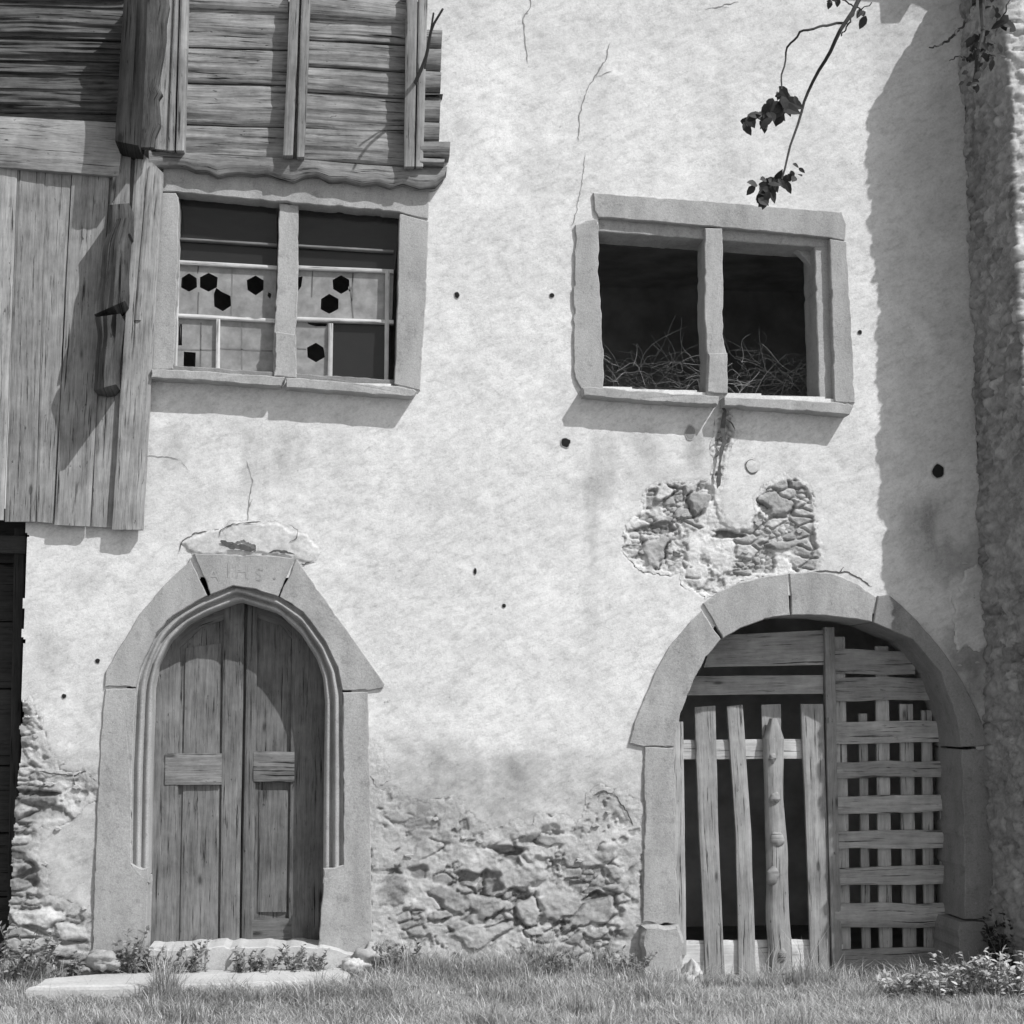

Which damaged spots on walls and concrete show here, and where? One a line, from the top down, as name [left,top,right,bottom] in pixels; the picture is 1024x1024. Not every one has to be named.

crack [522,0,531,63]
crack [571,44,610,226]
crack [246,463,254,521]
flaking render [179,519,321,565]
spalling [622,404,826,599]
spalling [2,695,99,976]
spalling [368,741,648,972]